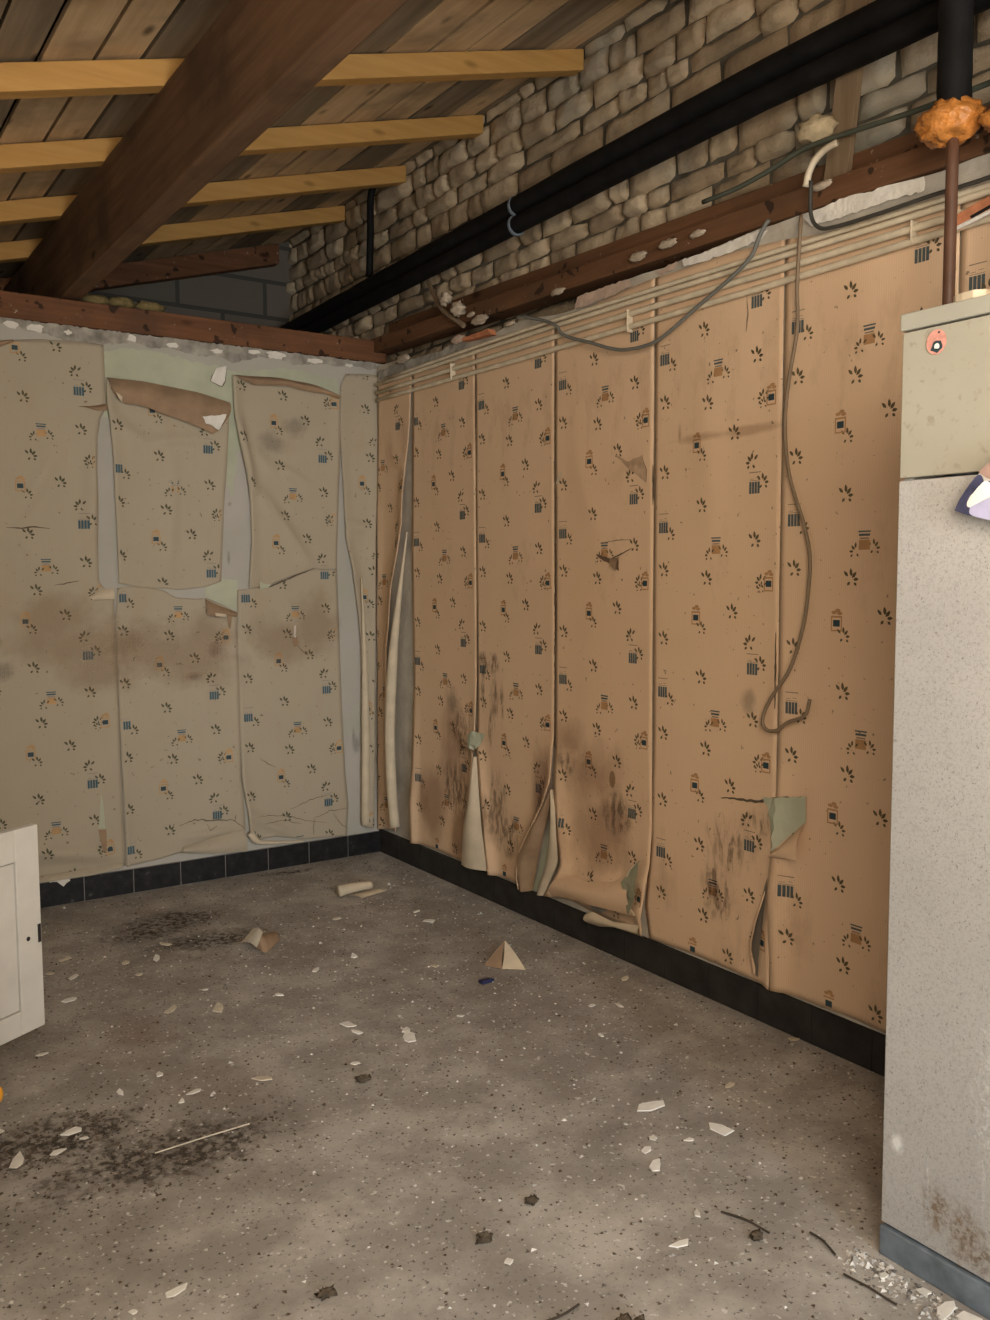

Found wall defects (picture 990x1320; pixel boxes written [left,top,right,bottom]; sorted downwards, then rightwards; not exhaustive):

spalling [575,278,631,309]
flaking render [0,317,466,497]
flaking render [205,579,238,611]
flaking render [763,797,806,852]